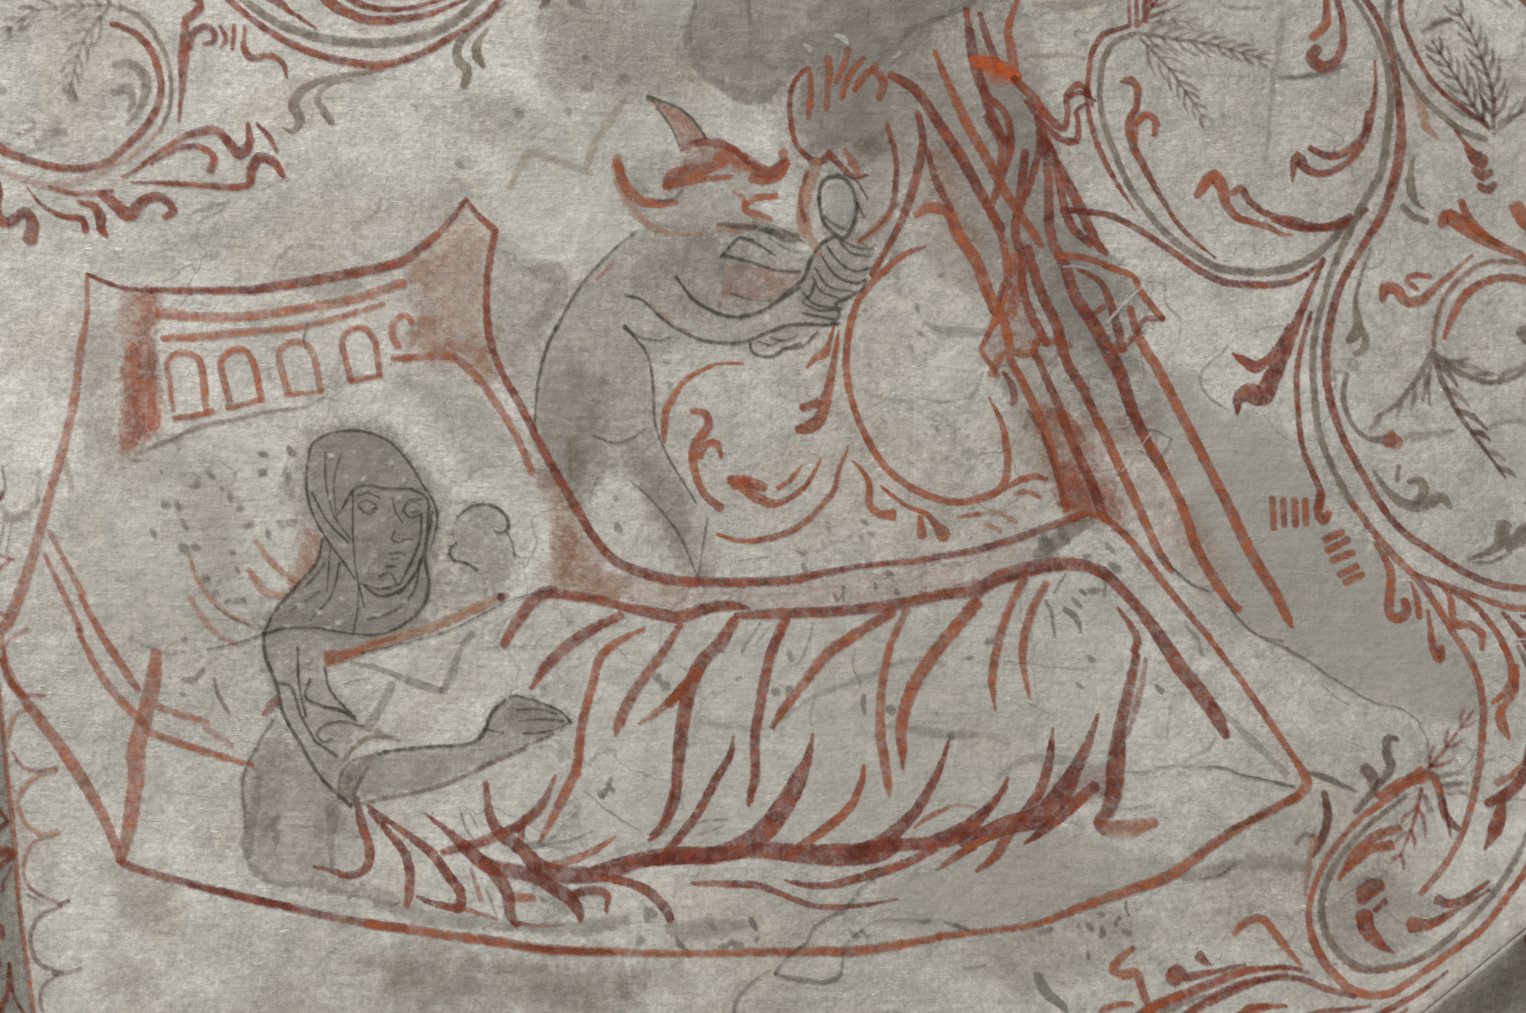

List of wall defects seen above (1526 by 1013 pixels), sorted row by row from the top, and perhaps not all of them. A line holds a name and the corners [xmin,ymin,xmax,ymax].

water stain [684,0,988,103]